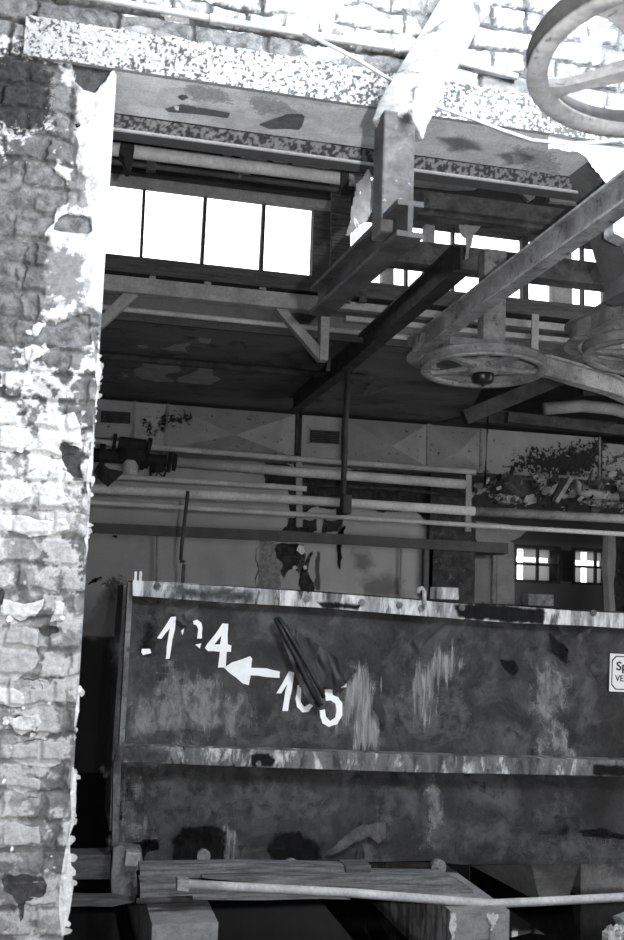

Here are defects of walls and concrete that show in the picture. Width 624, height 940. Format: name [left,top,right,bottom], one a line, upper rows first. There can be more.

flaking render [72,63,114,93]
flaking render [0,154,93,362]
peeling [0,354,104,538]
peeling [85,521,93,557]
peeling [0,588,85,794]
corrosion [455,602,576,757]
corrosion [593,765,624,777]
peeling [2,767,80,936]
spalling [612,912,624,925]